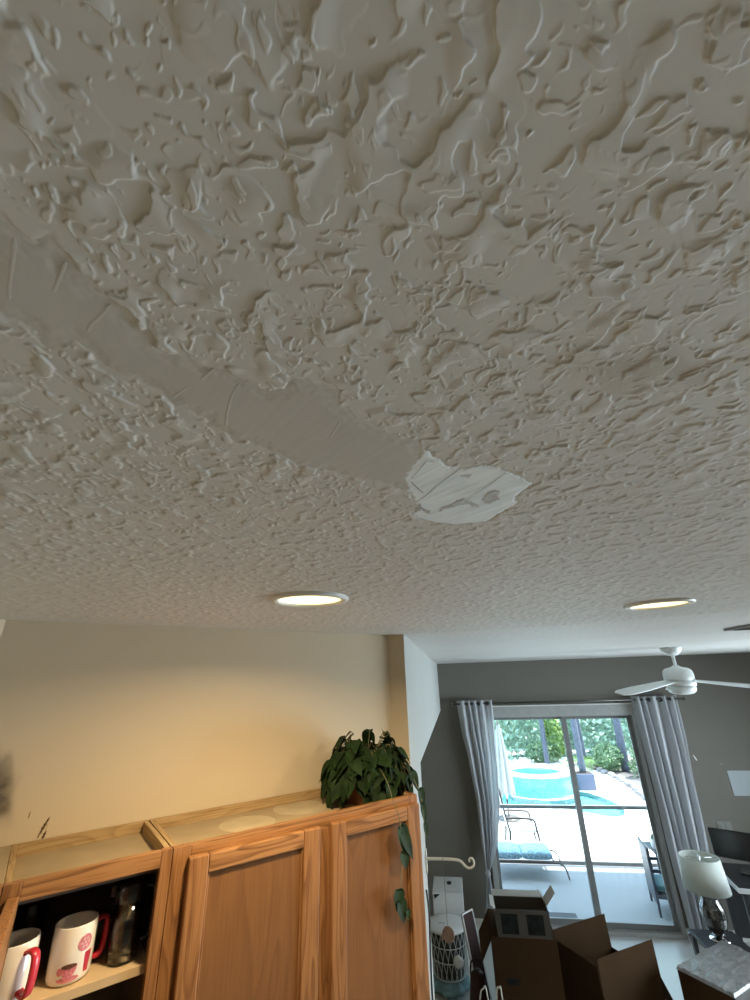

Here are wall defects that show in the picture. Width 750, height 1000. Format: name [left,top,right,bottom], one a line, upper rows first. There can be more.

peeling [404,449,532,524]